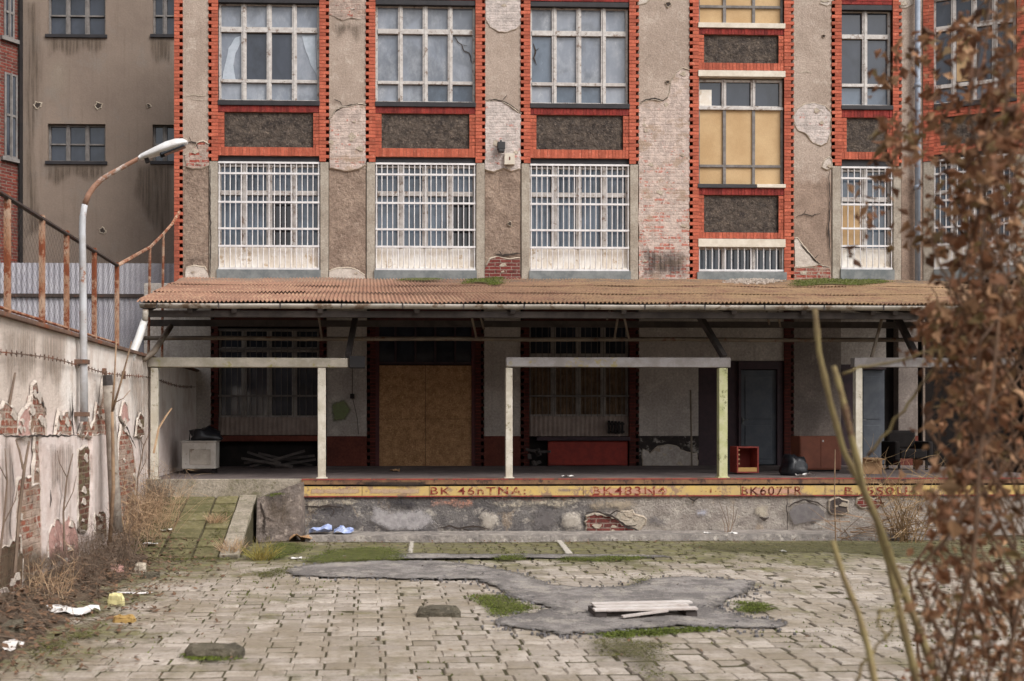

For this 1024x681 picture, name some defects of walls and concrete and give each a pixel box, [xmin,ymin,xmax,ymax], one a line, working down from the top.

flaking render [184,140,210,170]
flaking render [329,103,367,172]
flaking render [484,100,521,173]
flaking render [638,67,690,279]
flaking render [485,256,521,279]
damp [645,253,679,273]
flaking render [793,237,832,280]
peeling [641,444,698,466]
flaking render [0,374,145,593]
spalling [584,489,667,531]
peeling [746,489,797,517]